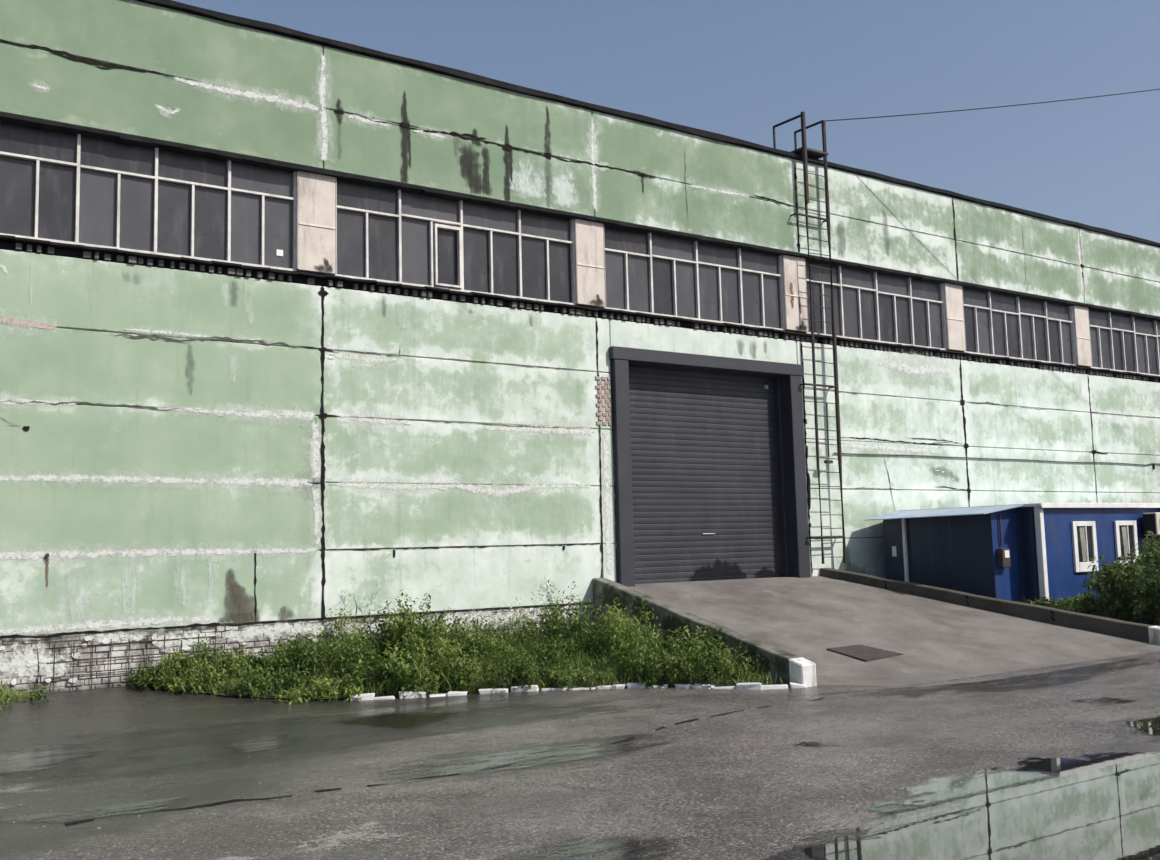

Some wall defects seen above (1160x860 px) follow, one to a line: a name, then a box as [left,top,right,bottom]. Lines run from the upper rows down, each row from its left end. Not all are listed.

crack [0,39,174,79]
damp [400,91,411,183]
damp [456,129,490,194]
damp [503,108,578,207]
damp [209,566,259,624]
peeling [0,610,339,685]